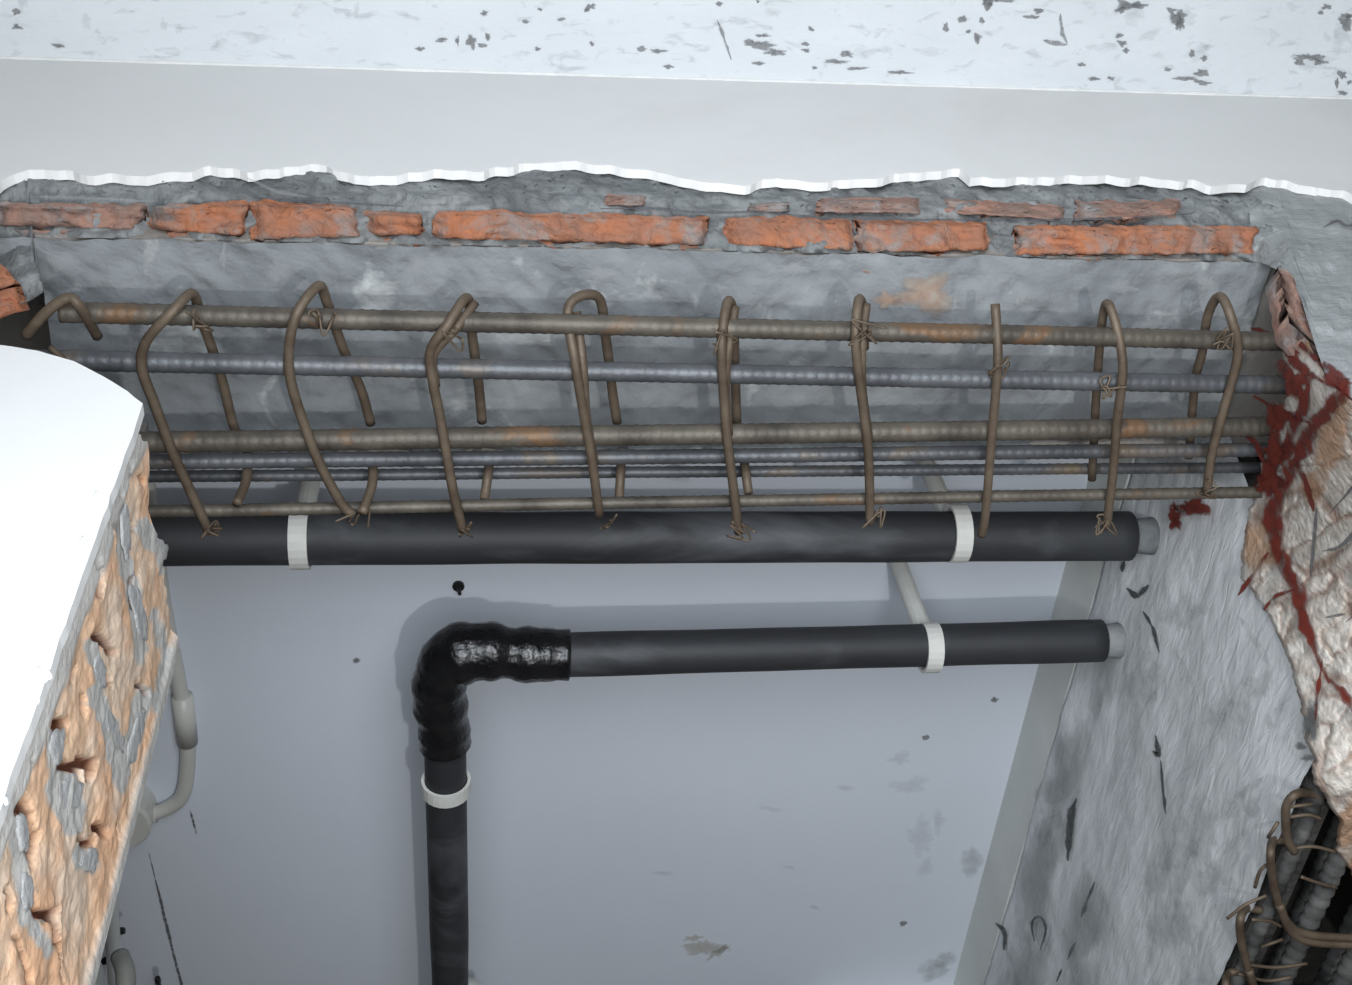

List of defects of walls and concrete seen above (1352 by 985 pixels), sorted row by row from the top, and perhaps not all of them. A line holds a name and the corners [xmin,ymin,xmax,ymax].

flaking render [0,170,1352,446]
spalling [0,281,1352,985]
rust [1168,499,1210,530]
rust [1238,342,1352,721]